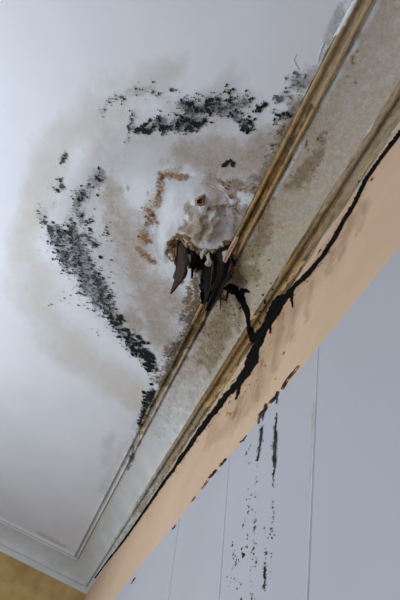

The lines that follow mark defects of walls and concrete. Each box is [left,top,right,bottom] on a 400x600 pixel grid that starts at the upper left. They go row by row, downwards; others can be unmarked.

flaking render [166,236,239,318]
damp [36,1,400,427]
crack [94,130,400,578]
damp [231,515,272,592]
rust [133,80,400,513]
rust [165,0,374,274]
damp [240,365,299,468]